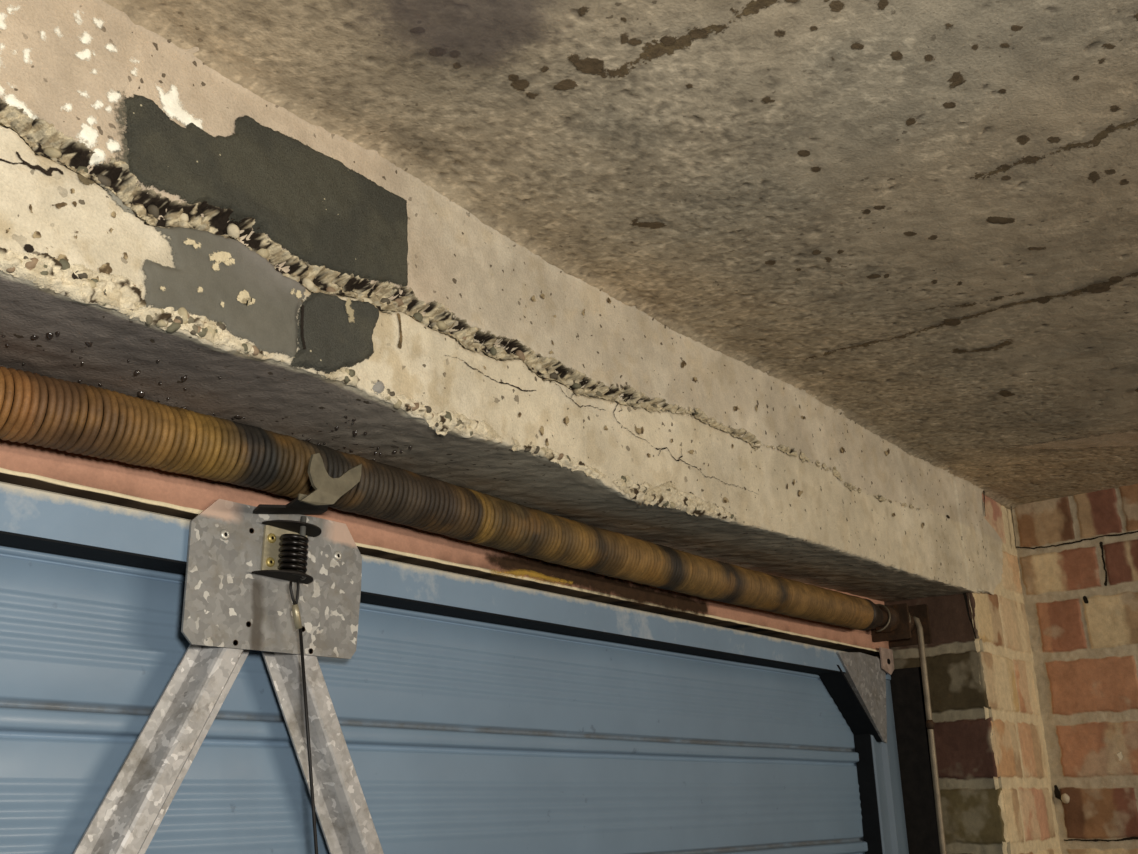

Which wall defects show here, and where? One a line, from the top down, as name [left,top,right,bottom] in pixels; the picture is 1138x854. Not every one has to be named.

crack [970,118,1138,180]
spalling [0,231,284,362]
crack [0,98,928,510]
crack [806,272,1138,359]
spalling [317,368,360,387]